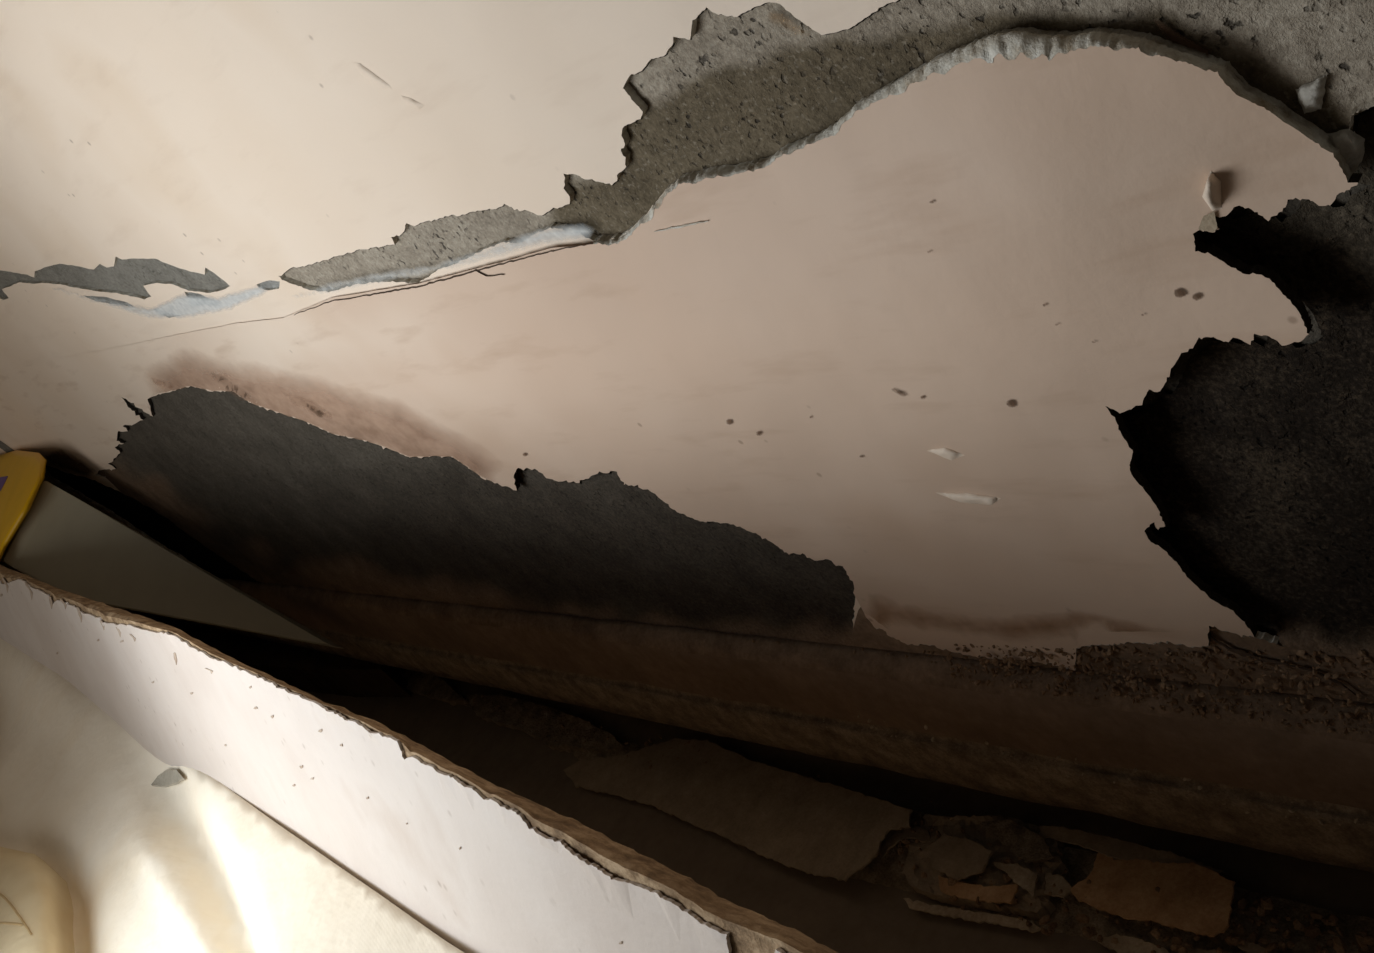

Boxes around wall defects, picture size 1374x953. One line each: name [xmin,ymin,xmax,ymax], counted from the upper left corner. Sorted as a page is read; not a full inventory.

flaking render [259,0,1374,289]
flaking render [0,258,229,305]
leakage [1121,109,1374,656]
flaking render [98,386,855,645]
peeling [880,826,1235,953]